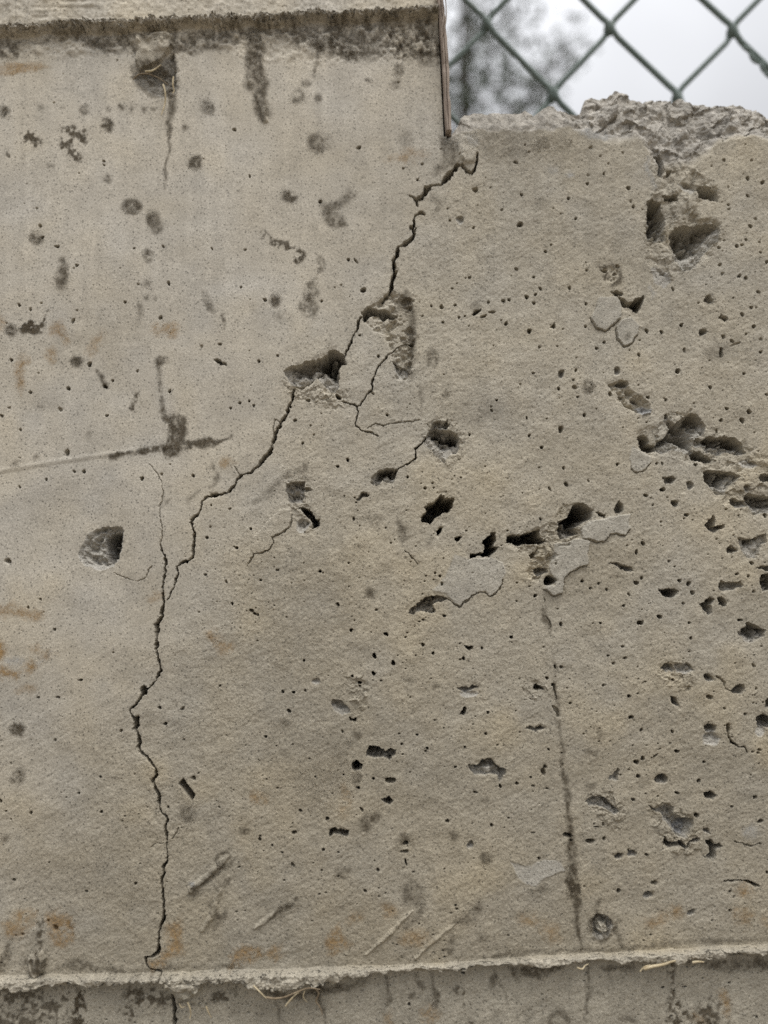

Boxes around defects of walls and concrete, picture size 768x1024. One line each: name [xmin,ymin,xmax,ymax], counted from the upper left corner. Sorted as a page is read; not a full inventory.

crack [384,151,479,300]
spalling [446,91,768,292]
crack [344,316,362,358]
spalling [361,290,417,382]
spalling [280,377,351,412]
crack [349,353,422,470]
spalling [607,366,768,517]
peeling [433,555,506,605]
crack [448,579,504,609]
spalling [505,501,631,595]
crack [113,396,293,1024]